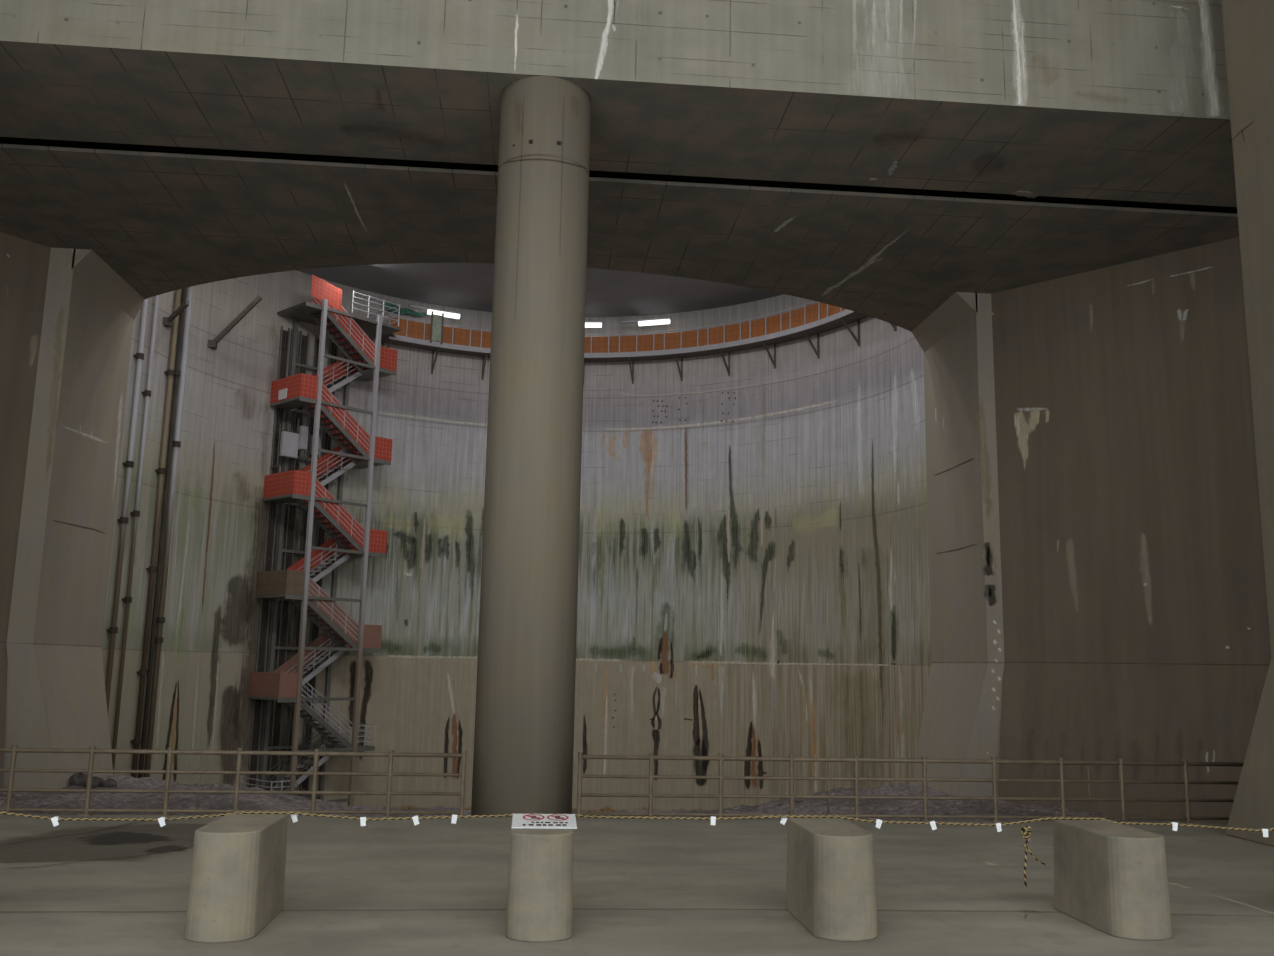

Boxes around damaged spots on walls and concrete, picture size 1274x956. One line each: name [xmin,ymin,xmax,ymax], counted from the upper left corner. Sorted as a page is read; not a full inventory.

leakage [159,681,179,781]
leakage [194,498,301,784]
leakage [349,660,373,758]
leakage [632,609,674,775]
leakage [684,686,709,786]
leakage [745,685,767,789]